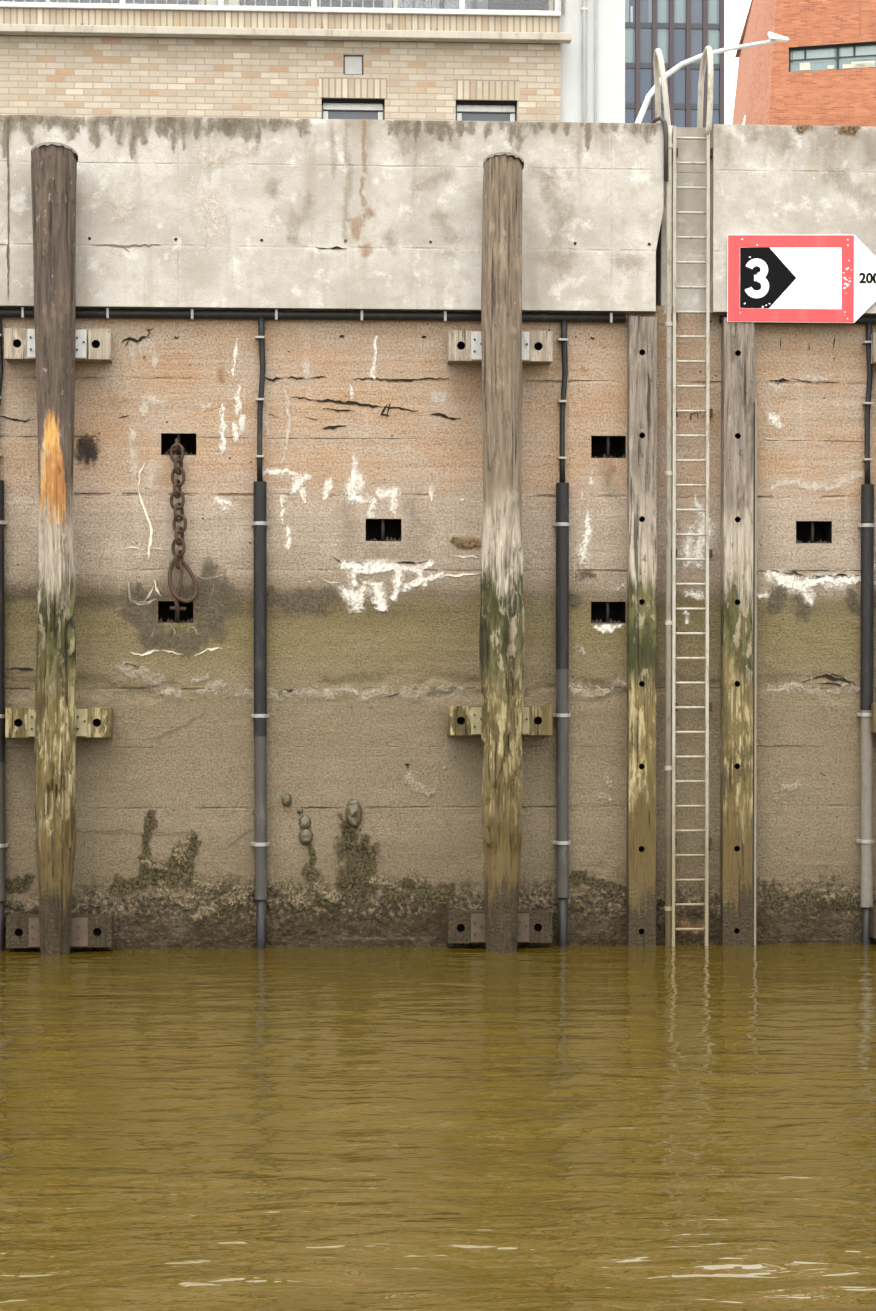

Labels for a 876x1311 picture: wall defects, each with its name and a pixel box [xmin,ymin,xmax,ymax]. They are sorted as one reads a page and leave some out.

damp [0,115,309,166]
damp [202,338,245,454]
crack [265,376,461,430]
damp [267,559,444,616]
damp [757,564,876,622]
damp [5,874,36,895]
damp [108,810,202,897]
damp [302,812,455,909]